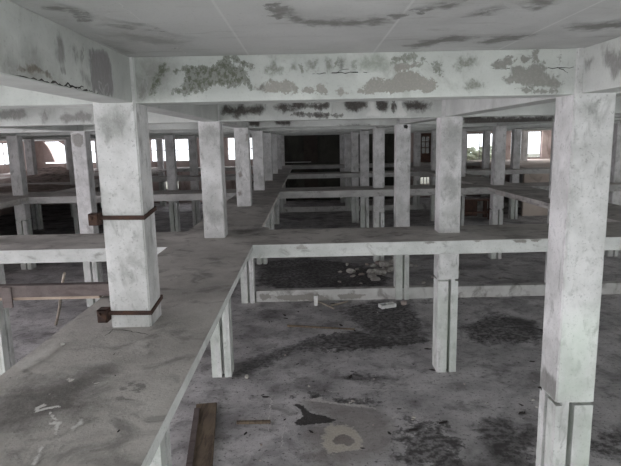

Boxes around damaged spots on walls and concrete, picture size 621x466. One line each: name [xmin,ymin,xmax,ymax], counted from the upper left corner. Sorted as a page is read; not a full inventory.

water stain [262,0,470,29]
water stain [520,0,560,13]
crack [15,75,98,94]
water stain [0,22,255,103]
peeling [253,62,439,97]
water stain [262,33,538,78]
water stain [451,51,486,95]
peeling [491,49,565,94]
water stain [199,100,433,146]
water stain [255,257,393,289]
water stain [231,298,433,381]
water stain [457,310,544,351]